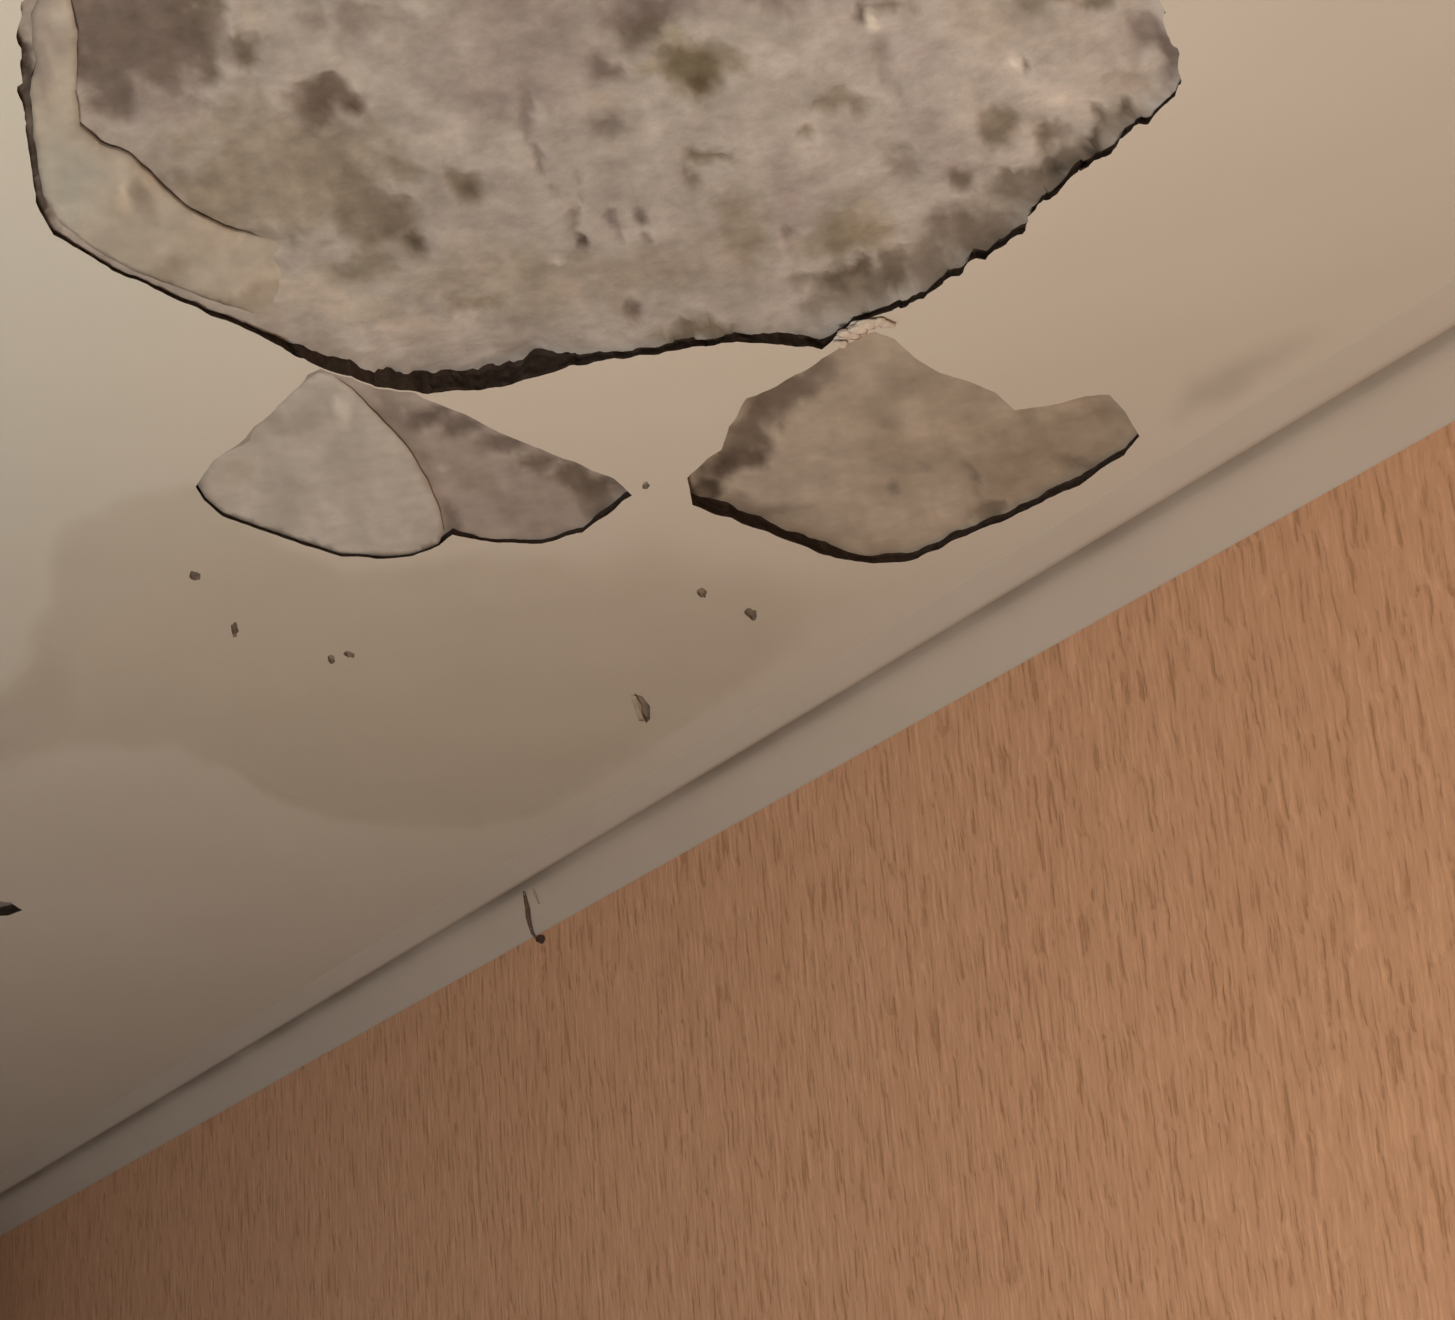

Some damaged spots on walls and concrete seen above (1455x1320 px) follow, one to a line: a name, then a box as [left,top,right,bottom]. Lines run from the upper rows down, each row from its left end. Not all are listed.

spalling [16,0,1181,563]
flaking render [0,901,22,916]